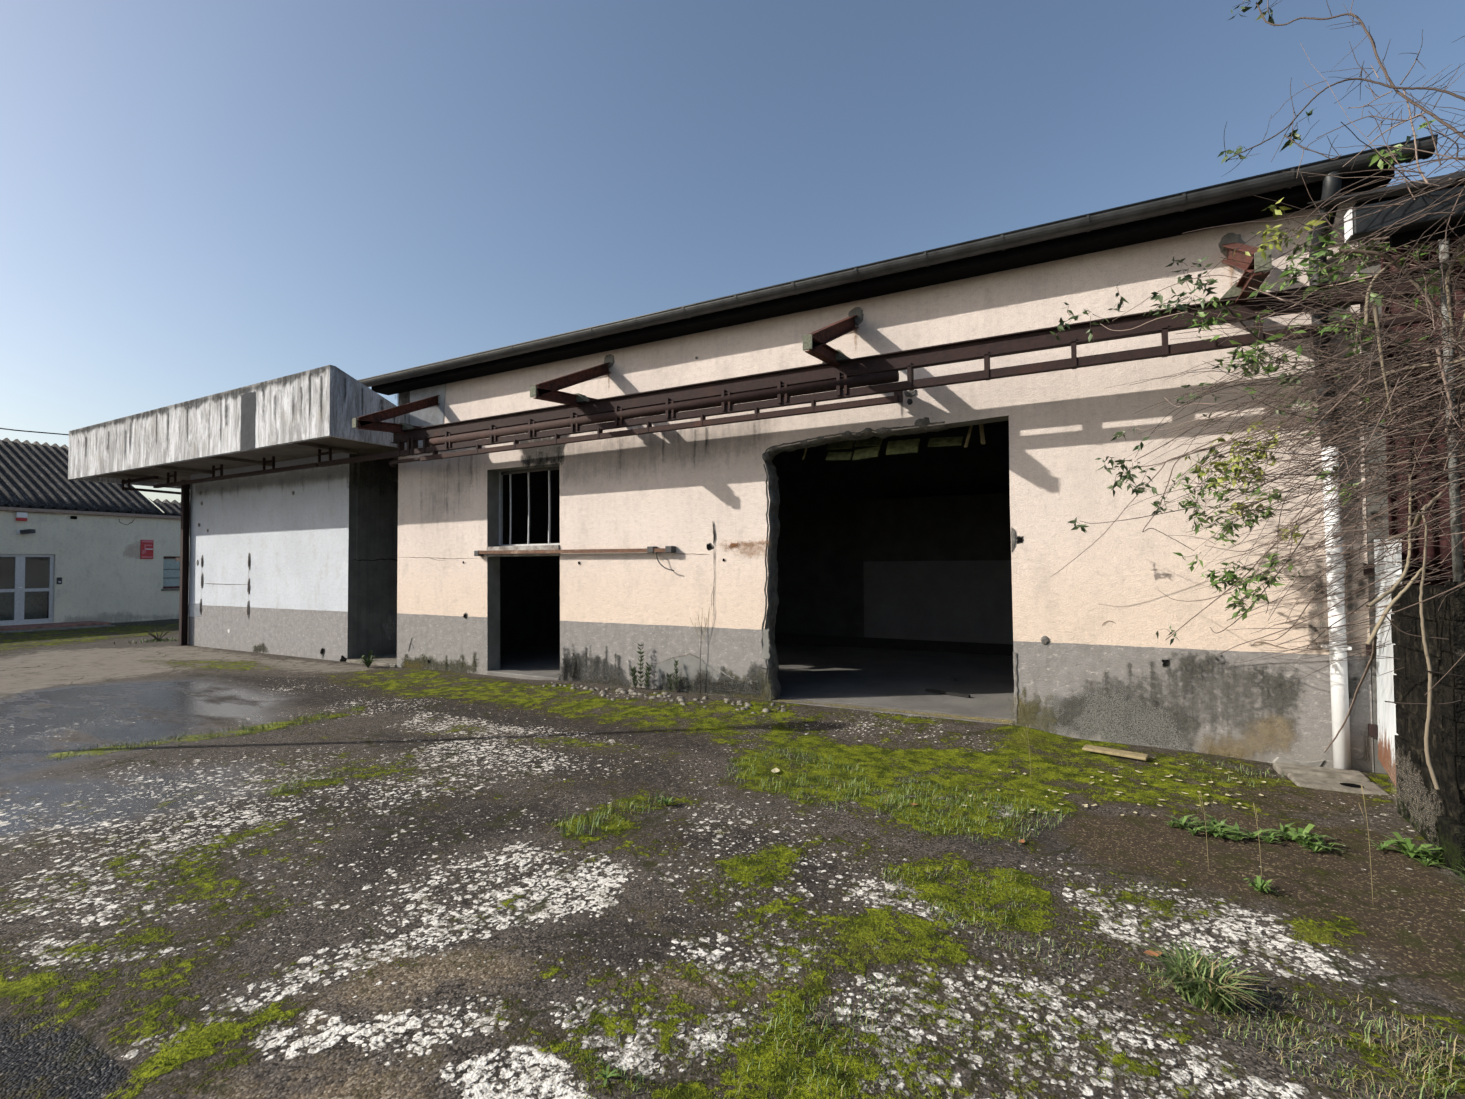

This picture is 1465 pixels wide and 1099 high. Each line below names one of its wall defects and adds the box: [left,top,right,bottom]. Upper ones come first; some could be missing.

leakage [71,366,325,457]
leakage [381,391,410,423]
leakage [1201,715,1292,759]